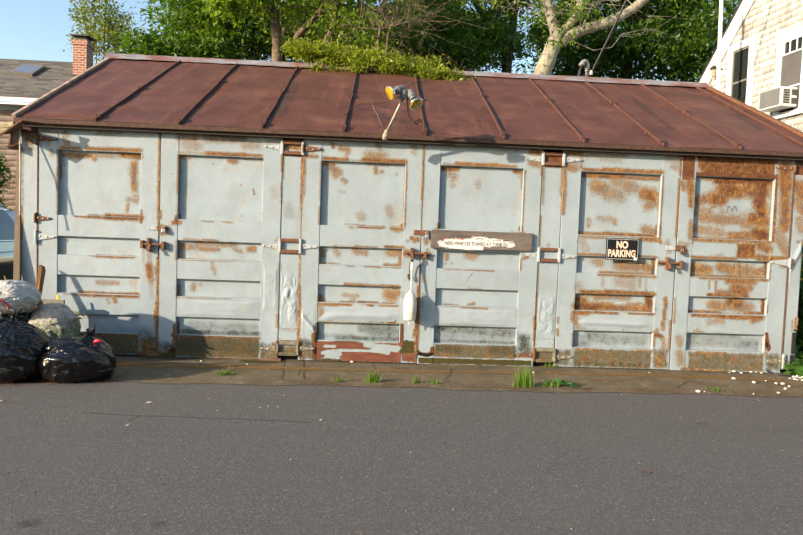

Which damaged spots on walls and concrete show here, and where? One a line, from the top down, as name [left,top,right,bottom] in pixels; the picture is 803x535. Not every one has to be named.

corrosion [50,137,143,223]
corrosion [280,139,430,268]
corrosion [441,149,803,381]
damp [95,321,263,356]
peeling [317,341,401,363]